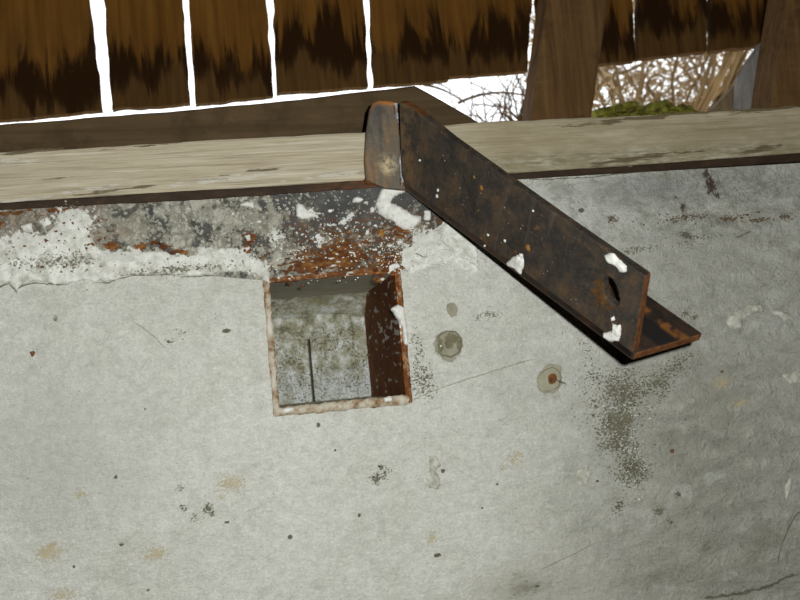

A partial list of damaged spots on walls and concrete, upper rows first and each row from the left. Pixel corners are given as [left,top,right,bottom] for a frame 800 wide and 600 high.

peeling [20,217,51,232]
corrosion [239,222,413,287]
damp [537,339,705,515]